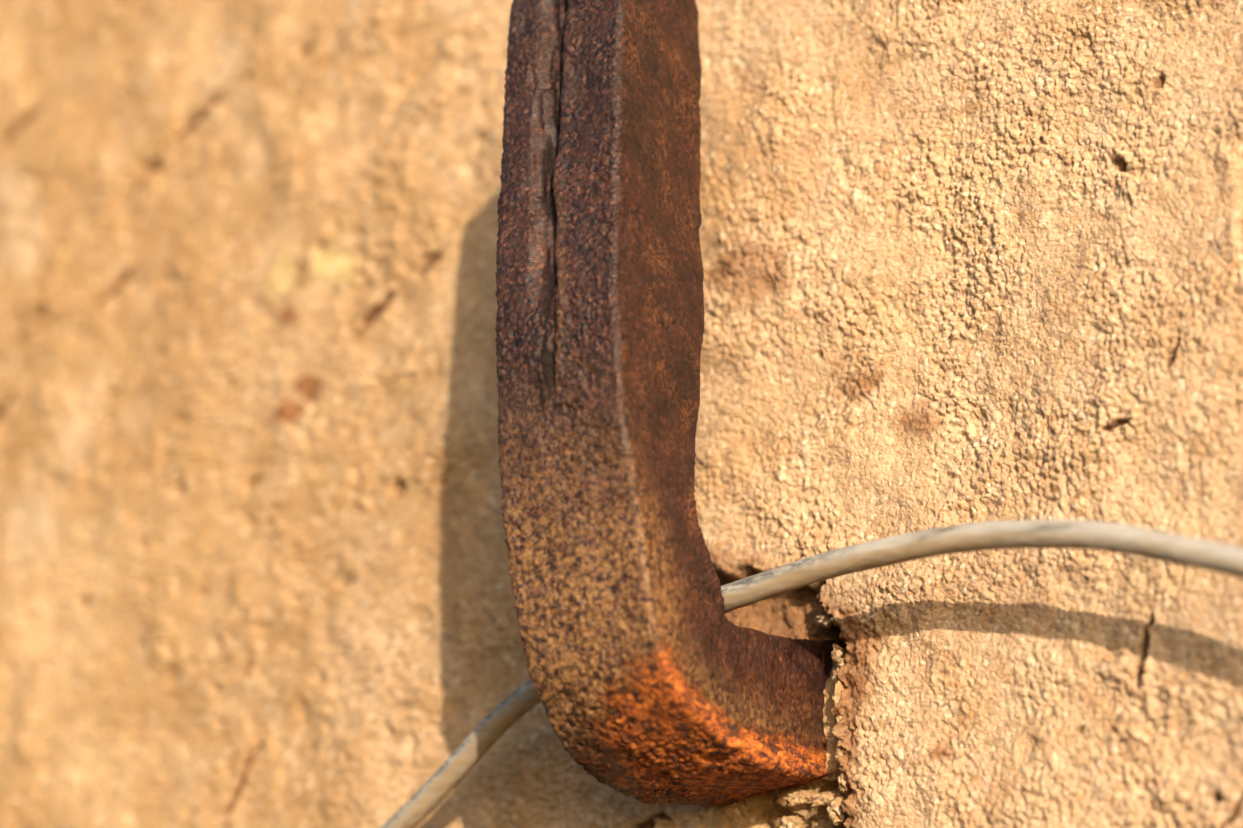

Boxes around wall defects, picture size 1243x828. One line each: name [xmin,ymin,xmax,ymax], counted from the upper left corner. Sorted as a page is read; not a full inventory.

rust [600,616,876,826]